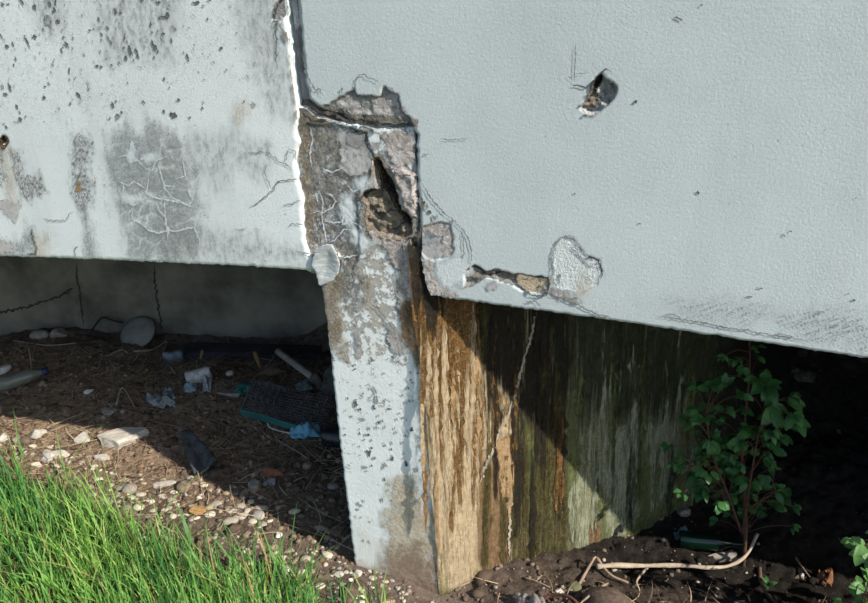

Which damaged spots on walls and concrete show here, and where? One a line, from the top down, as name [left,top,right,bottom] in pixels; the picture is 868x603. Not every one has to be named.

spalling [568,44,617,116]
damp [0,152,45,202]
damp [106,121,272,262]
crack [245,149,302,228]
crack [273,0,472,287]
crack [27,211,74,255]
crack [0,247,84,327]
crack [153,265,163,334]
spalling [298,73,603,594]
damp [794,308,868,352]
damp [402,237,736,596]